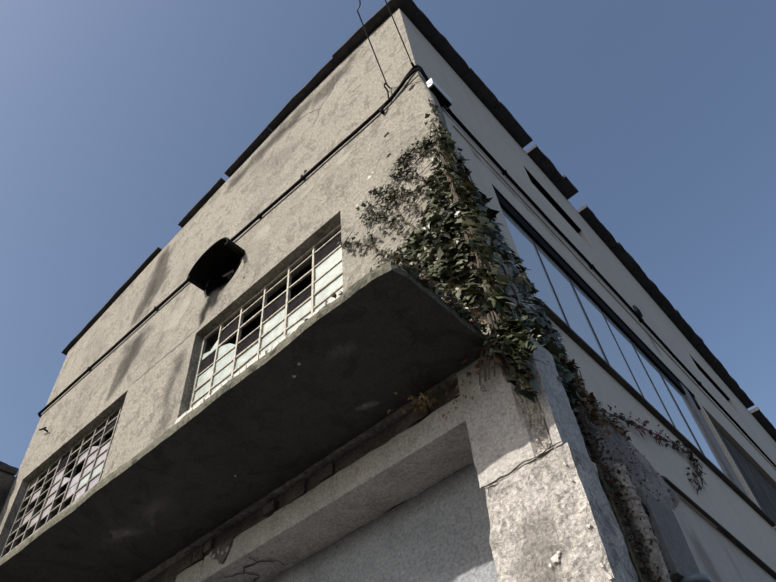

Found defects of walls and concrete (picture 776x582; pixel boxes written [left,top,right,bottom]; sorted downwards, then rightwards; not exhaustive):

damp [135,252,168,319]
damp [109,336,143,396]
crack [480,441,562,497]
spalling [208,538,232,564]
crack [225,558,284,582]